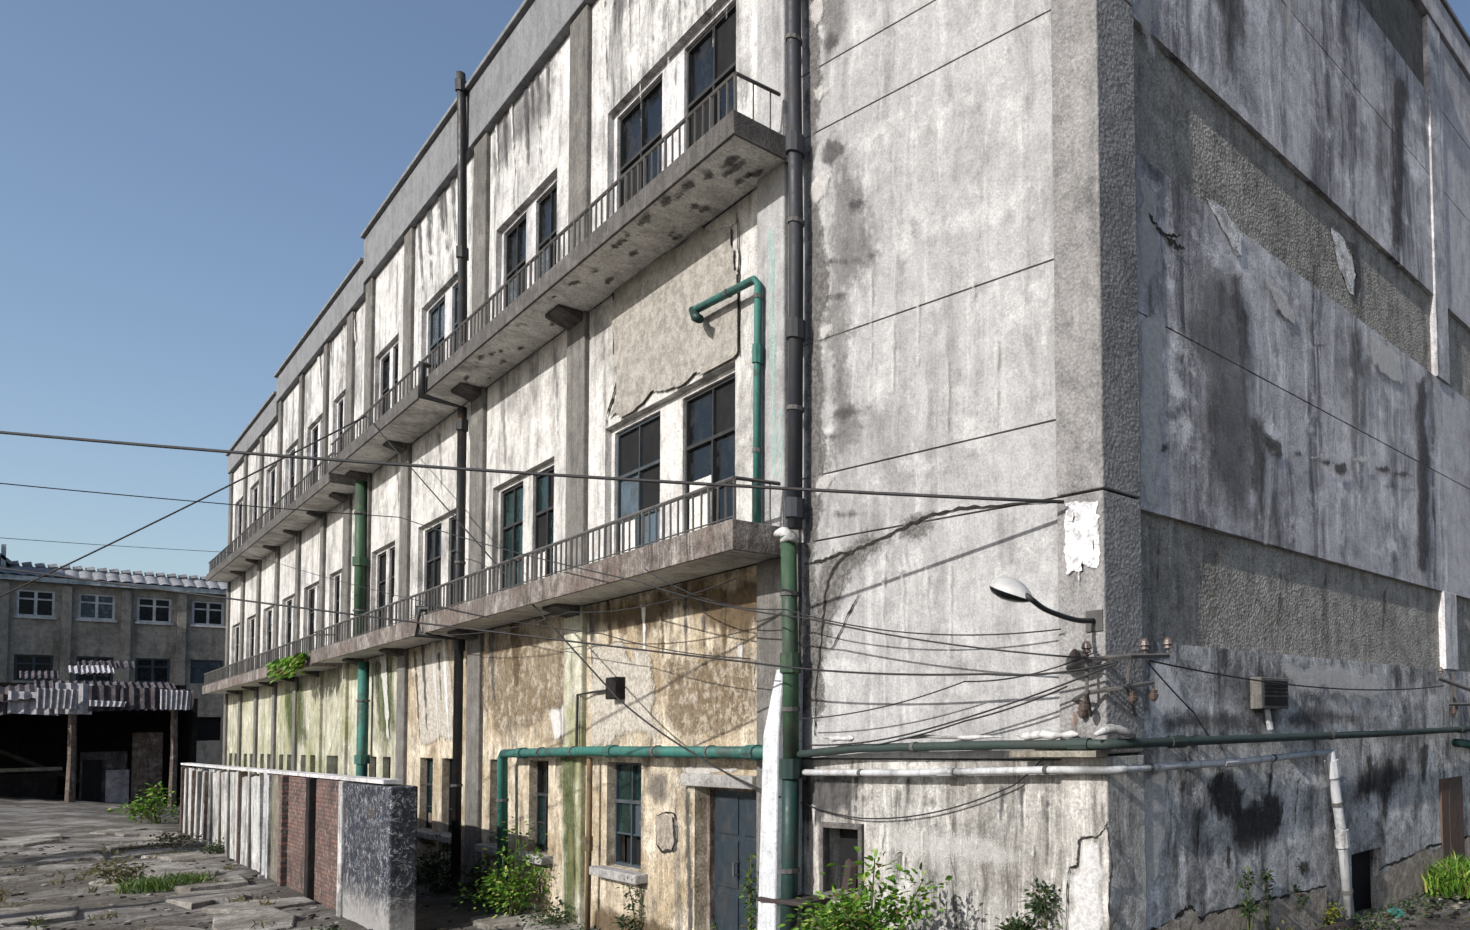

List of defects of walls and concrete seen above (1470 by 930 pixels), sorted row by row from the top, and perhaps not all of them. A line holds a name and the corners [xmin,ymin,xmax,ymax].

water stain [1218,0,1244,61]
water stain [1390,78,1409,244]
peeling [1331,227,1362,297]
water stain [1251,420,1271,544]
water stain [1415,378,1430,571]
peeling [1063,501,1101,574]
water stain [587,580,757,684]
crack [804,502,1035,735]
water stain [1149,661,1382,732]
crack [1065,822,1123,930]
water stain [1145,771,1186,906]
water stain [1197,762,1301,870]